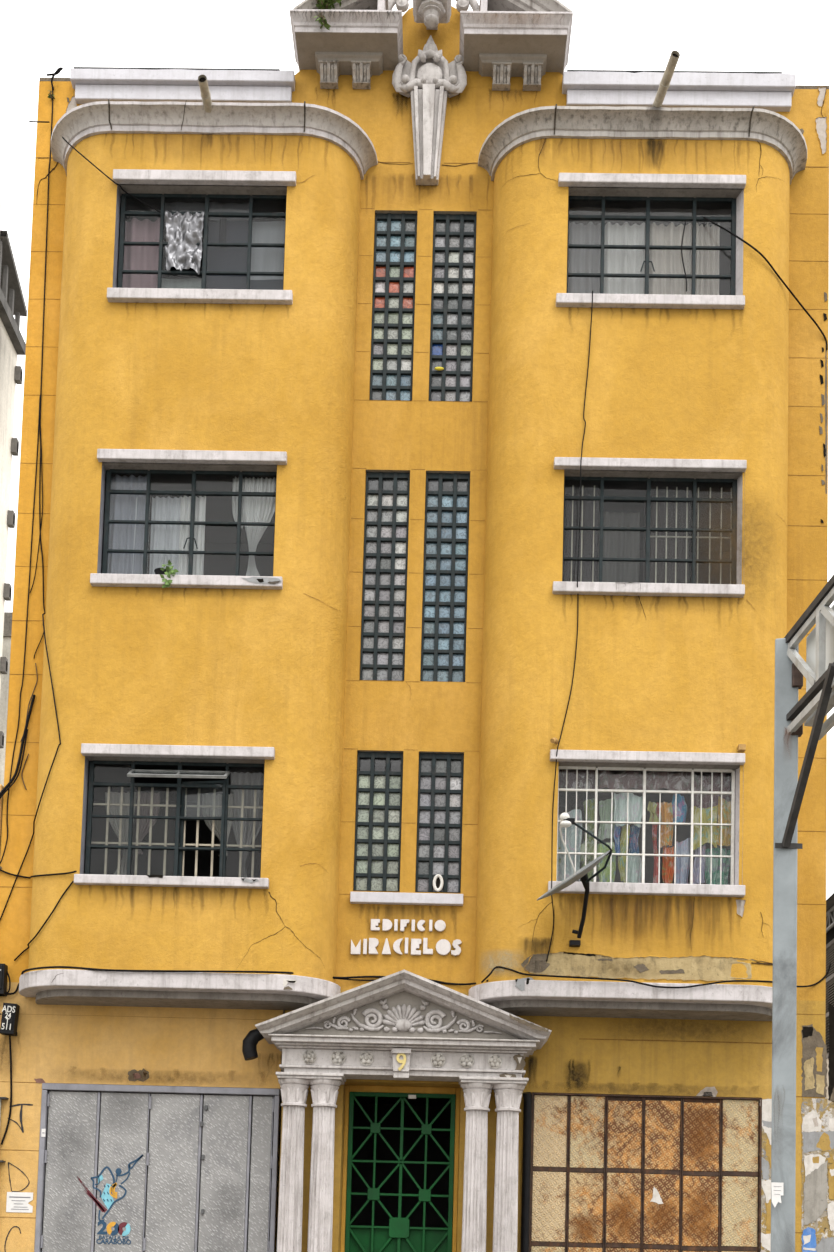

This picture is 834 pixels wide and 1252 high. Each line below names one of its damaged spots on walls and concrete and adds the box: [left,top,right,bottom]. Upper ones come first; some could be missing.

crack [242,892,325,968]
peeling [759,1098,772,1252]
peeling [801,1003,834,1252]